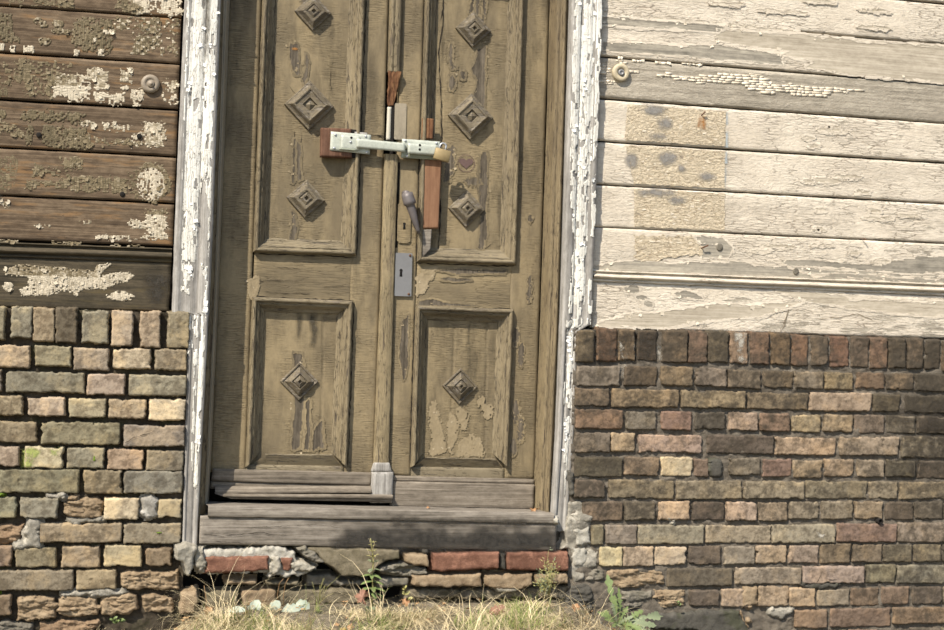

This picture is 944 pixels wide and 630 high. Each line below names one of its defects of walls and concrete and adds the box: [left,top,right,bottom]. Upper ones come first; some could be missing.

peeling [0,0,220,499]
peeling [426,396,495,458]
damp [660,153,684,171]
peeling [561,0,944,496]